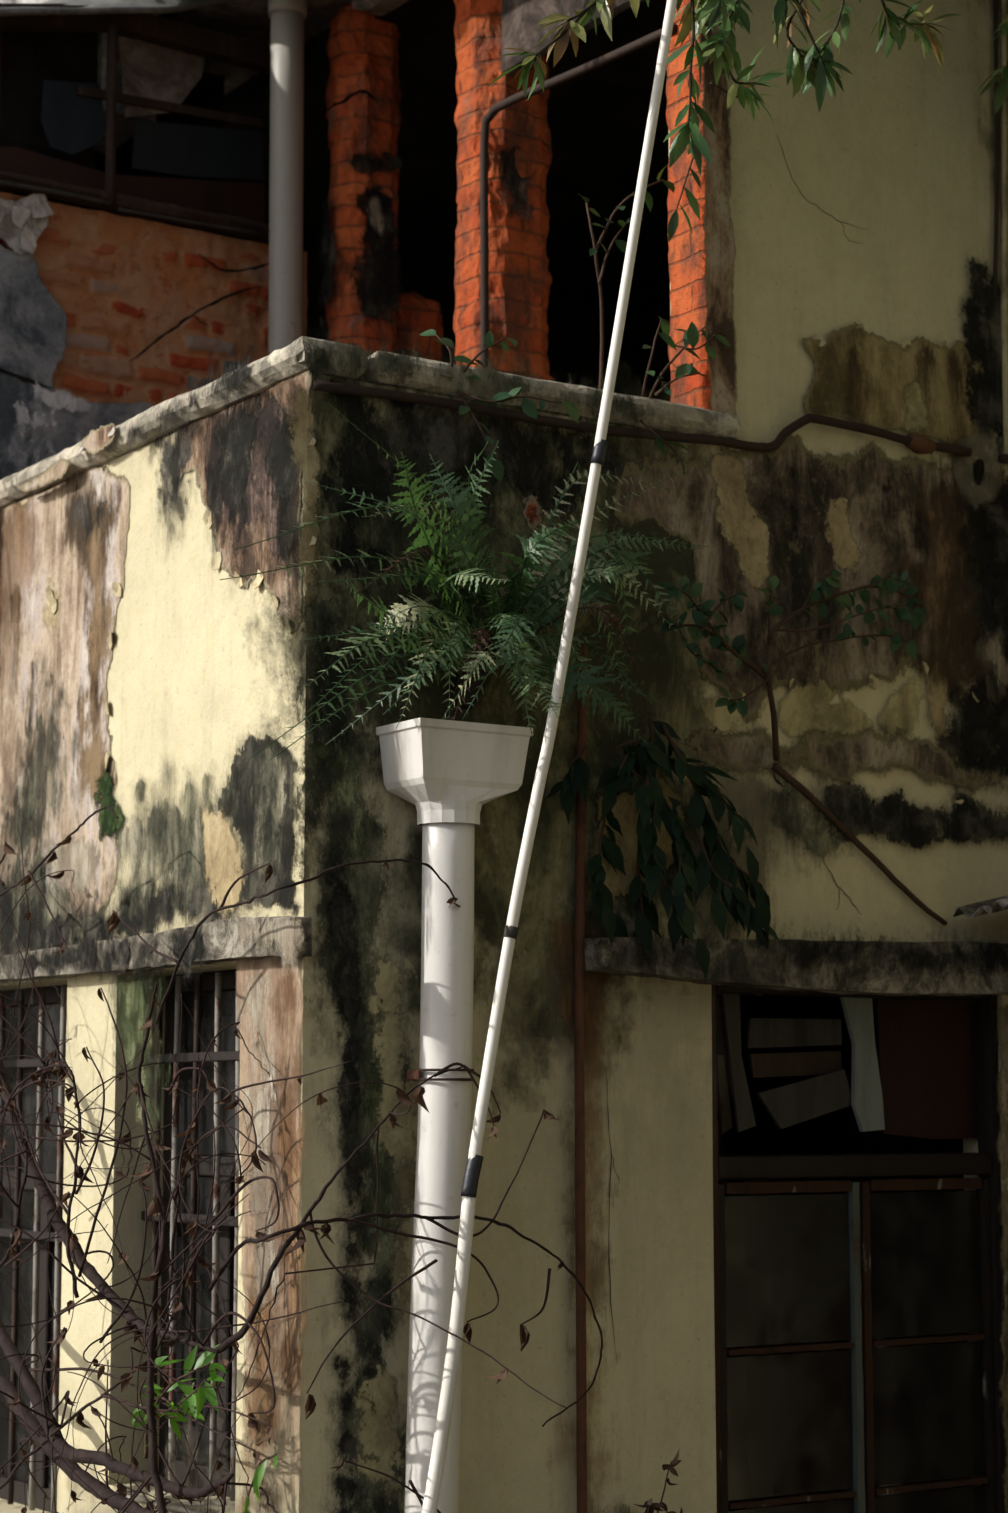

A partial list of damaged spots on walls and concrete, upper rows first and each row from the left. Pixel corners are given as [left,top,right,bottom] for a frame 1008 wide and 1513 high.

peeling [11,199,53,255]
water stain [316,152,404,323]
water stain [498,147,534,223]
flaking render [611,323,1008,793]
water stain [616,256,1008,982]
water stain [0,339,662,1513]
corrosion [236,956,303,1445]